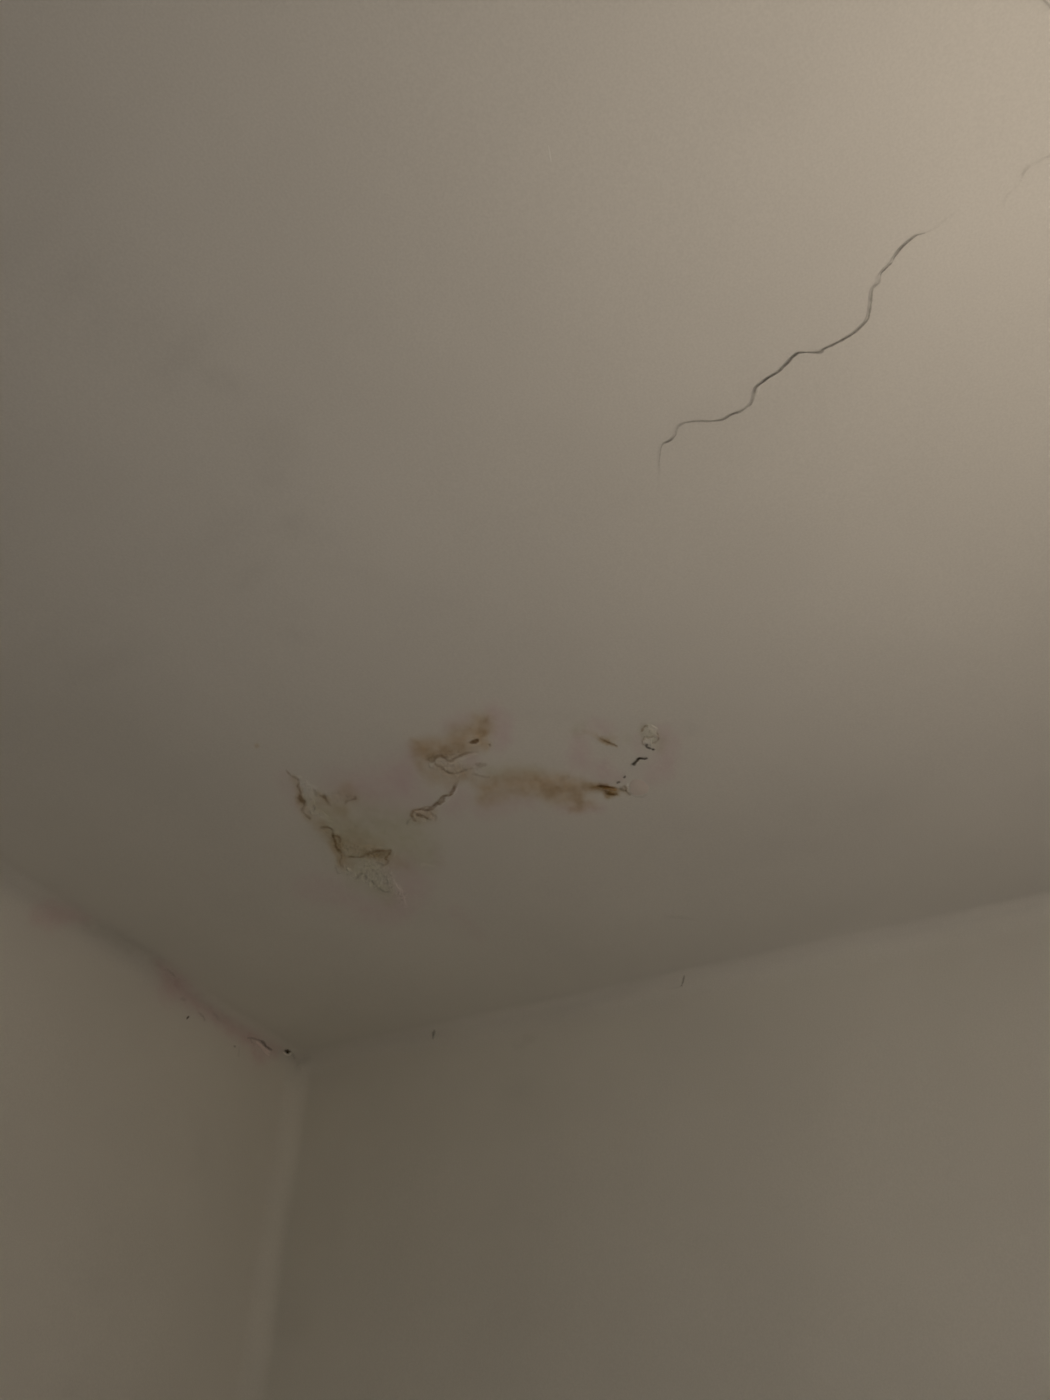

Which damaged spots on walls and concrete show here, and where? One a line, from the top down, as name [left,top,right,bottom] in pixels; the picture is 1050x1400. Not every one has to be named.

crack [723,321,867,420]